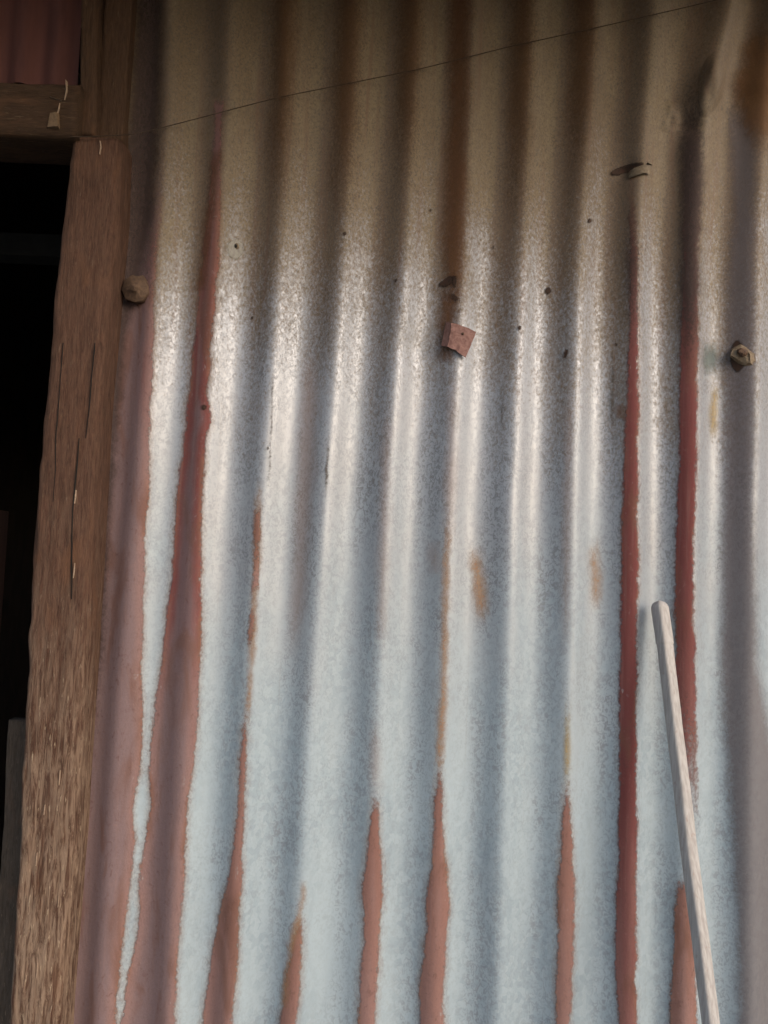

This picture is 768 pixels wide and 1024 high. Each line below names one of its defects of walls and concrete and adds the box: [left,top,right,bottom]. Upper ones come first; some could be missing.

rust [439,0,469,356]
rust [74,101,224,1024]
rust [203,724,247,1024]
rust [280,918,303,1024]
rust [358,804,384,1024]
rust [418,542,450,1024]
rust [555,790,576,1024]
rust [614,207,640,1024]
rust [669,882,698,1024]
rust [674,284,700,789]